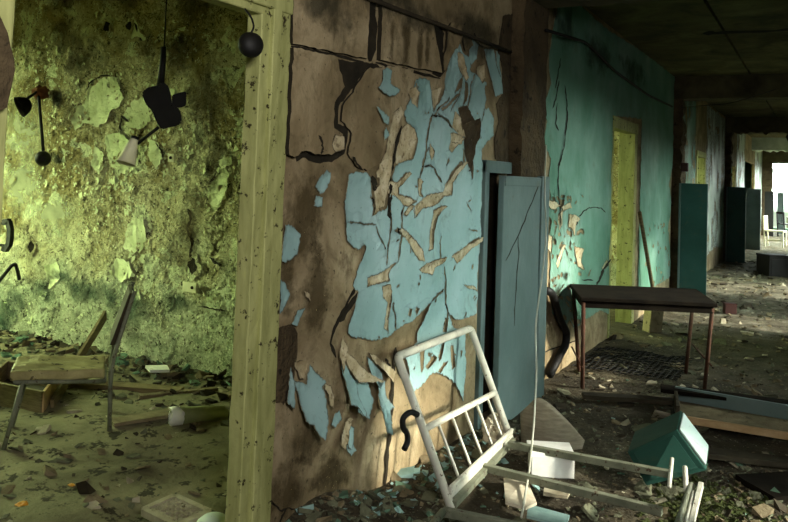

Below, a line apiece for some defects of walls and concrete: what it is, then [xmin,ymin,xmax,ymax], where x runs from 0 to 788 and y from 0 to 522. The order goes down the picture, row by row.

crack [291,2,446,79]
peeling [70,76,151,174]
peeling [148,138,163,169]
peeling [207,156,232,213]
crack [553,59,605,225]
peeling [544,6,696,328]
peeling [706,106,726,255]
hole [24,236,37,257]
peeling [44,262,60,289]
peeling [109,217,147,282]
peeling [275,14,513,456]
crack [506,187,538,326]